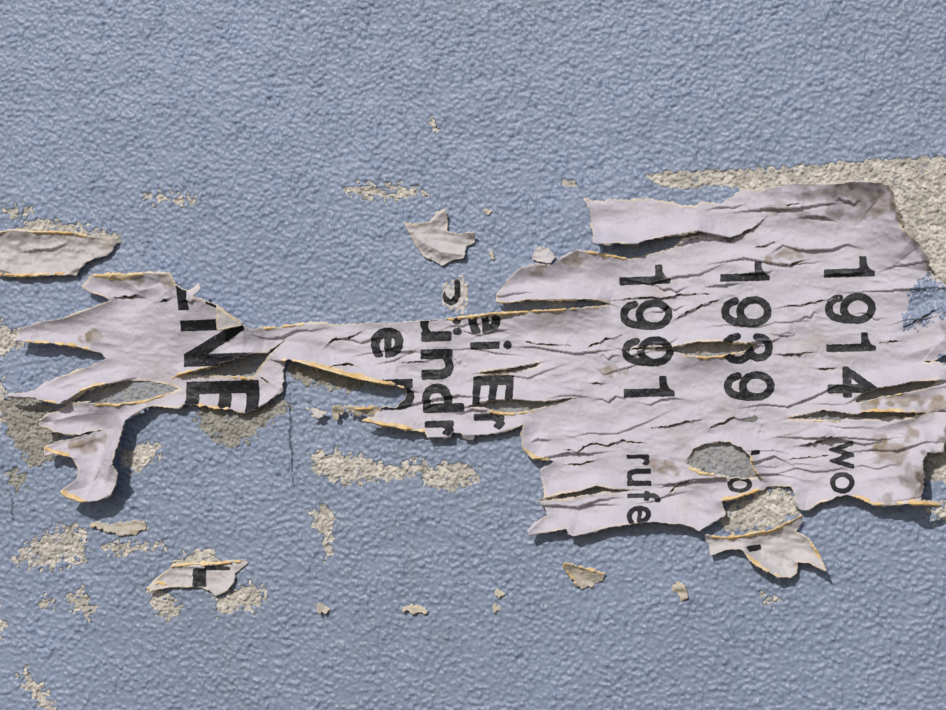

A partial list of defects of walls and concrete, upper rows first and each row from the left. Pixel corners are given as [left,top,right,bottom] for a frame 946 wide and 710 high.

flaking render [140,188,204,209]
flaking render [342,180,430,203]
flaking render [646,156,946,285]
flaking render [0,318,63,493]
flaking render [307,446,481,492]
flaking render [8,520,220,573]
flaking render [306,504,336,564]
flaking render [37,585,99,623]
flaking render [147,589,184,623]
flaking render [211,578,267,619]
flaking render [15,665,57,710]